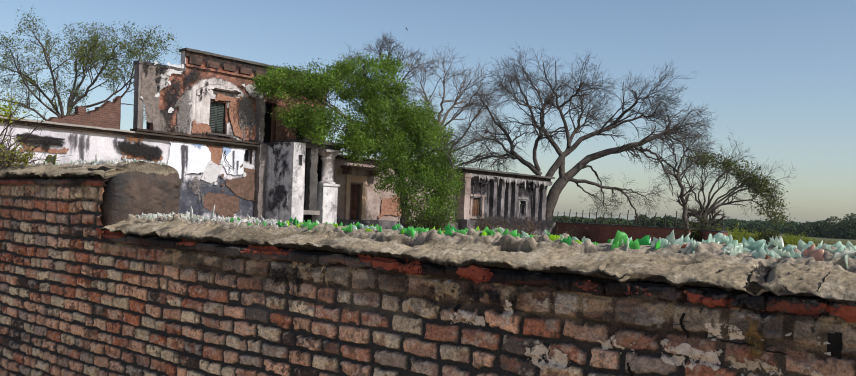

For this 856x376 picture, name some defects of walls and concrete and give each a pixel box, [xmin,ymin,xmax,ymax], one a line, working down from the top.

water stain [65,123,92,161]
water stain [172,130,254,218]
flaking render [188,119,256,218]
flaking render [215,93,257,142]
water stain [249,139,291,211]
crack [745,267,760,285]
peeling [525,340,569,370]
peeling [660,322,783,376]